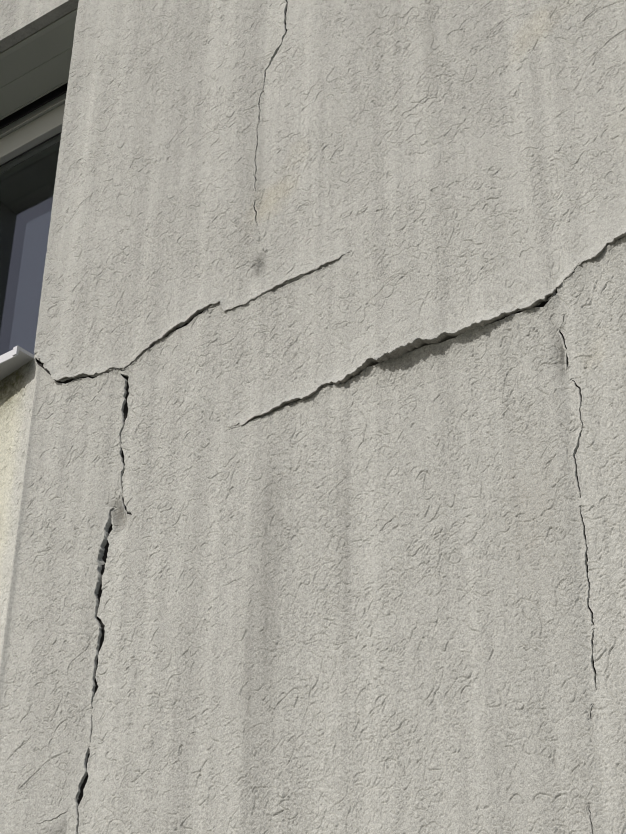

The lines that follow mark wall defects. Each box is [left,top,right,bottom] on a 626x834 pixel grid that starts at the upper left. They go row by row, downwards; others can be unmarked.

crack [252,0,289,244]
crack [62,368,133,834]
crack [557,314,600,736]
crack [587,803,595,834]